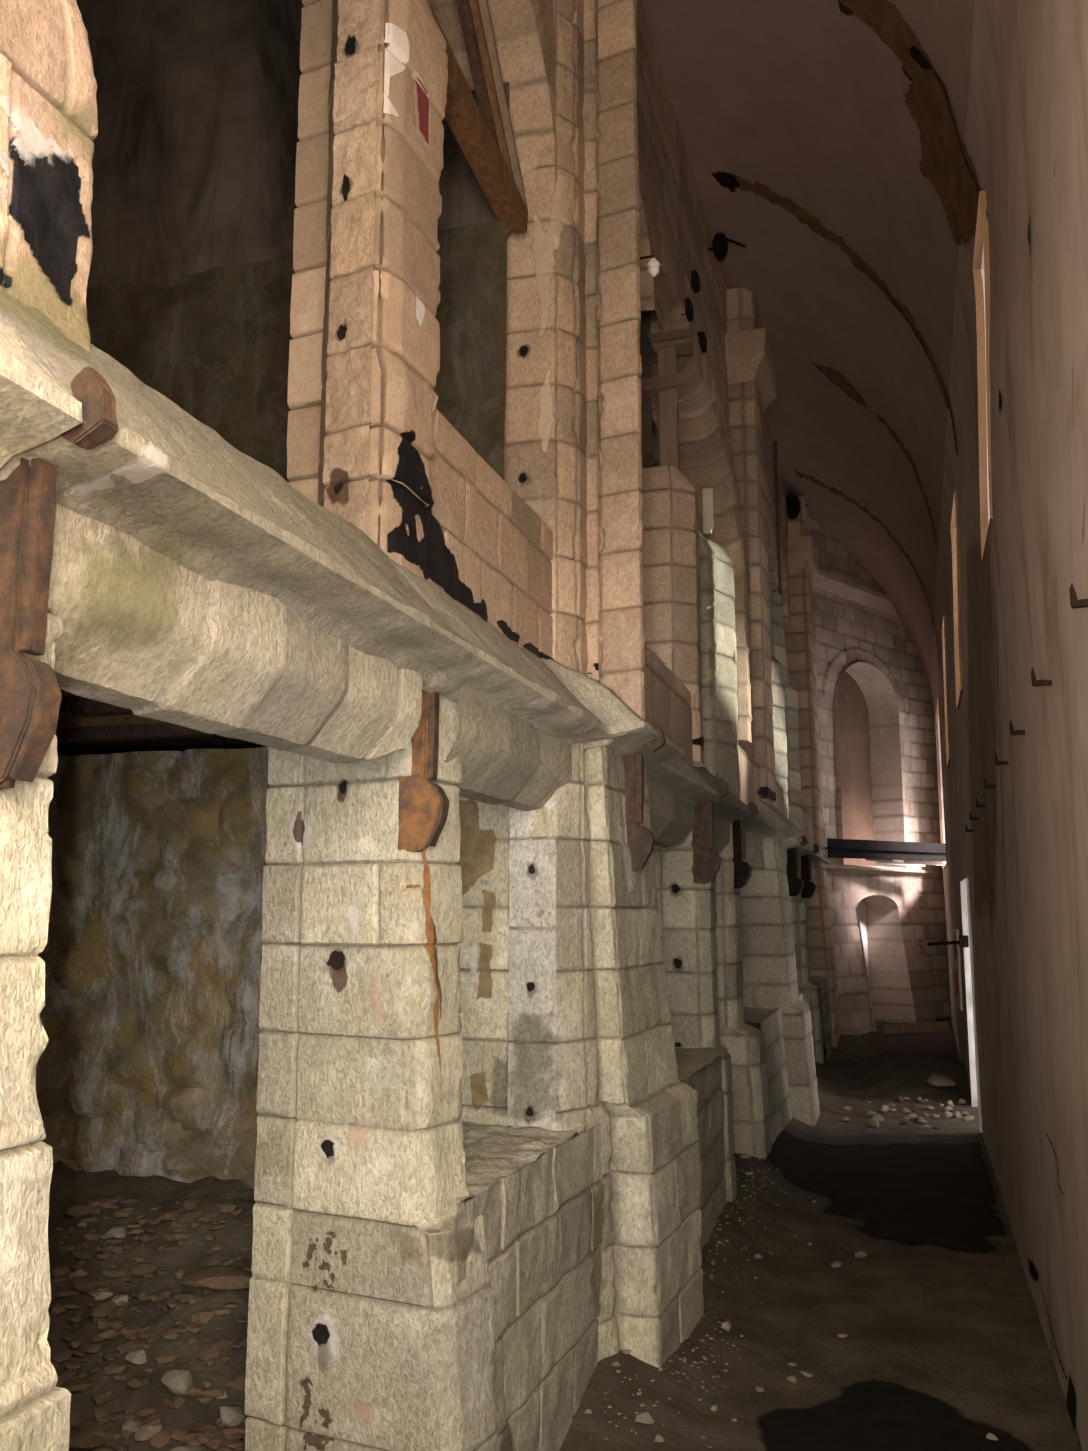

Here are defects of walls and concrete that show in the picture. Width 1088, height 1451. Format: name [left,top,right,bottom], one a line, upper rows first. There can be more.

peeling [0,268,12,288]
peeling [9,138,90,305]
peeling [838,0,988,246]
peeling [386,430,555,660]
rust [405,850,442,1076]
rust [301,1232,347,1292]